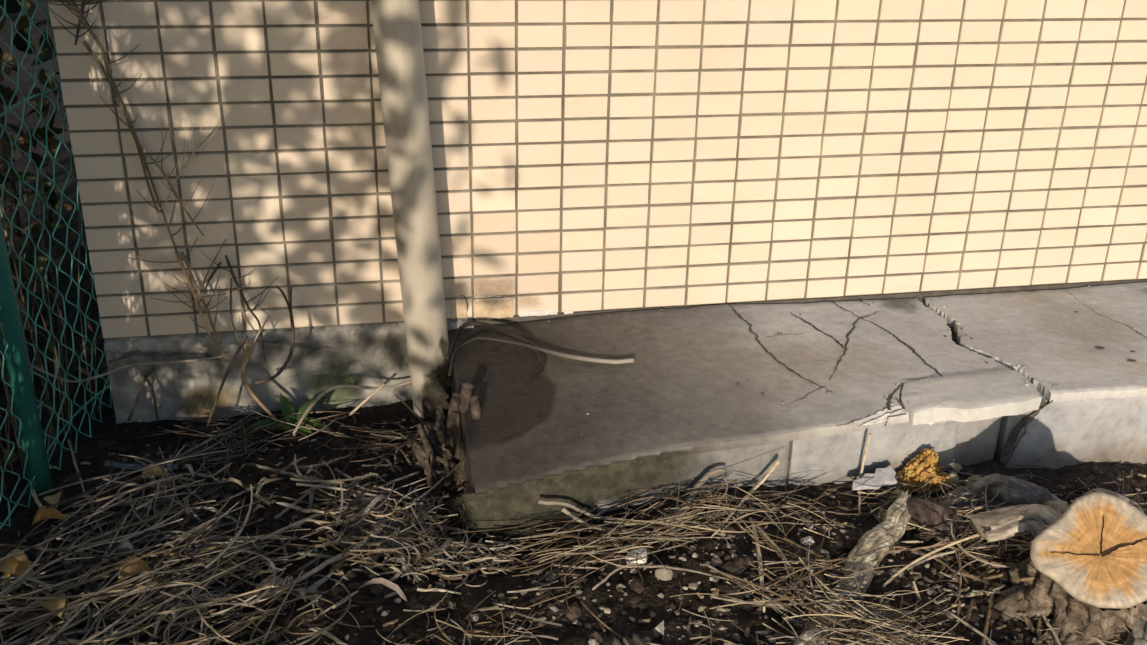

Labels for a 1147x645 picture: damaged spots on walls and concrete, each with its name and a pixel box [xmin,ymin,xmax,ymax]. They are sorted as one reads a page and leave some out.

water stain [453,330,554,446]
crack [725,298,942,426]
crack [947,324,959,345]
crack [1001,398,1053,456]